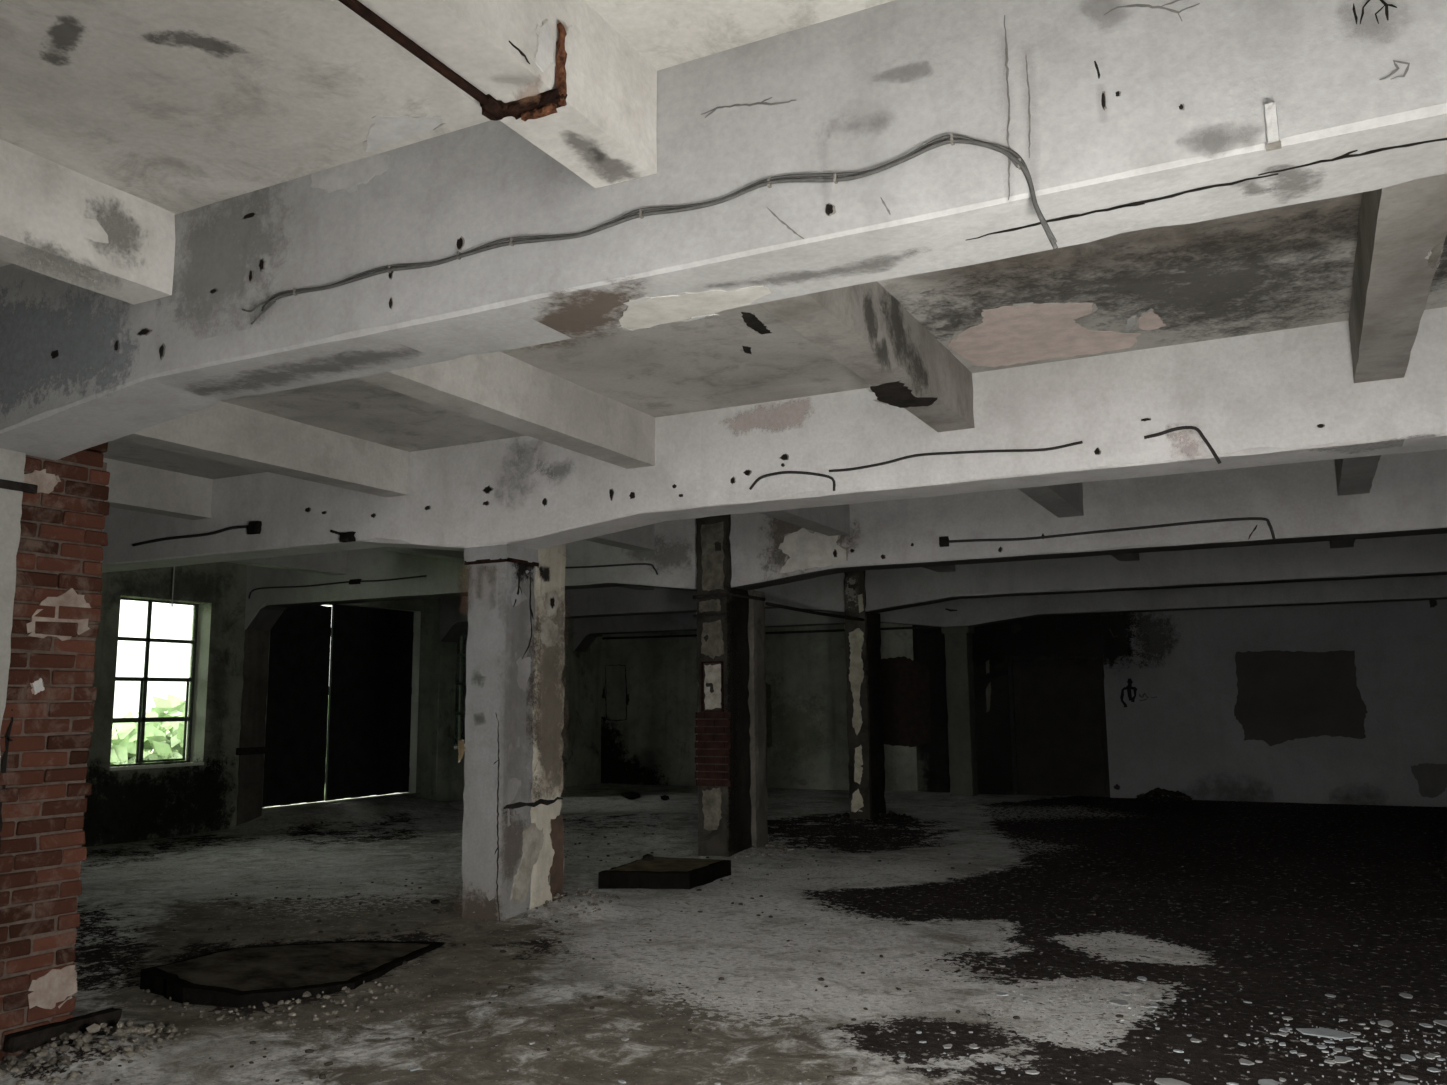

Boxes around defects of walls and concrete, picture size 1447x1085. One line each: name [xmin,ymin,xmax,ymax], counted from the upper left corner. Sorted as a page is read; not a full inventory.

crack [1353,0,1397,24]
crack [701,97,795,118]
crack [967,15,1447,240]
water stain [93,203,139,254]
water stain [28,244,117,289]
peeling [948,302,1166,367]
spalling [866,381,938,408]
peeling [26,588,91,641]
water stain [972,612,1177,673]
peeling [849,594,864,812]
crack [494,714,563,921]
peeling [28,965,77,1009]